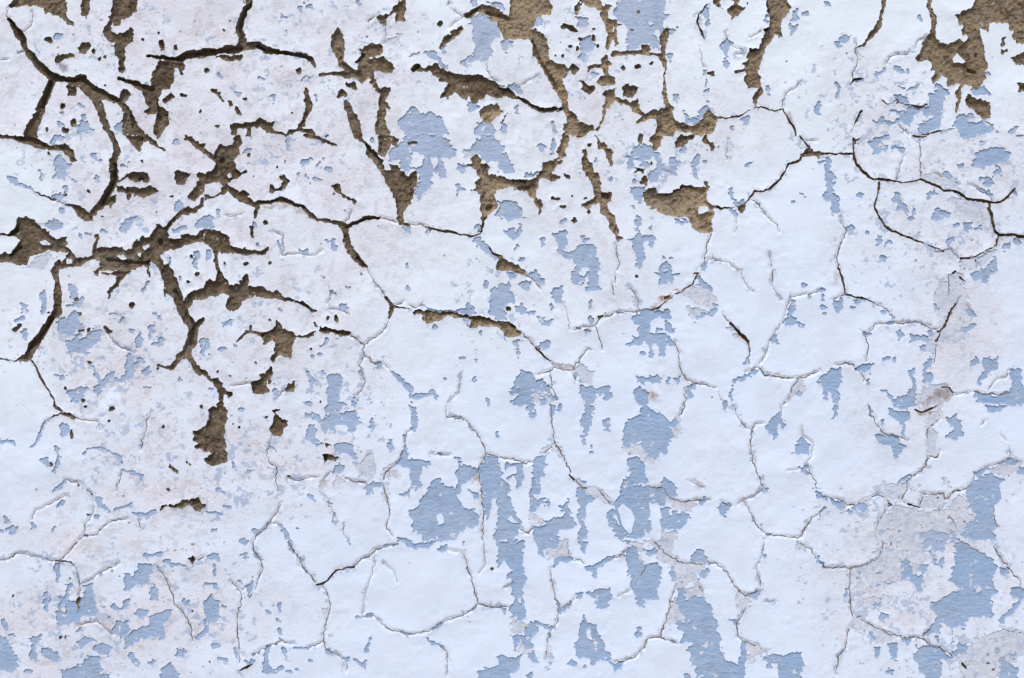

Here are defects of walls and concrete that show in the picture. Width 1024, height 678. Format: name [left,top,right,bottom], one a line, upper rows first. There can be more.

spalling [9,0,144,73]
crack [696,4,762,64]
crack [850,0,926,85]
crack [0,0,501,466]
spalling [337,0,809,419]
spalling [845,0,1024,460]
crack [0,472,140,634]
peeling [12,269,232,532]
crack [156,566,193,641]
peeling [199,286,806,678]
crack [232,82,1024,674]
peeling [791,437,1024,678]